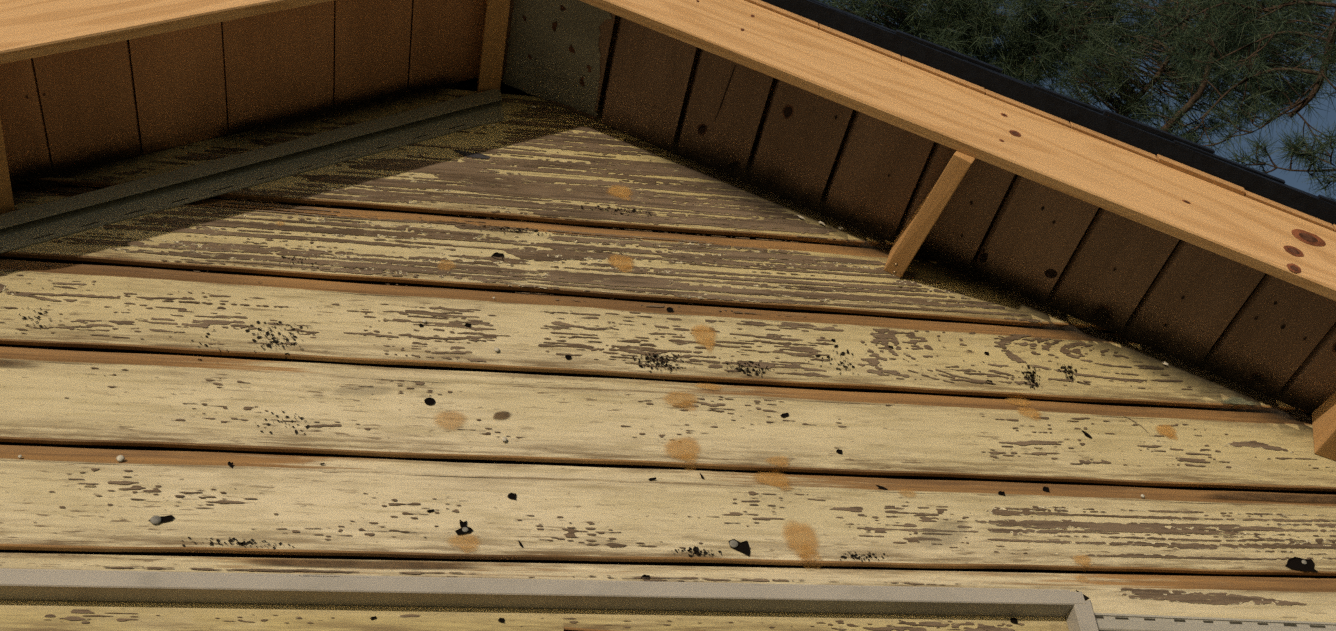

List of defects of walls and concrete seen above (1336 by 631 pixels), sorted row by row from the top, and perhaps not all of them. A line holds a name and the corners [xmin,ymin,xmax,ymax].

peeling [0,0,1192,390]
peeling [170,393,341,428]
rust [668,439,697,459]
peeling [621,396,815,443]
peeling [978,413,1333,471]
peeling [48,468,257,518]
peeling [274,493,468,540]
peeling [517,515,663,547]
rust [757,473,787,485]
rust [786,525,816,555]
peeling [709,491,1336,560]
peeling [95,564,358,573]